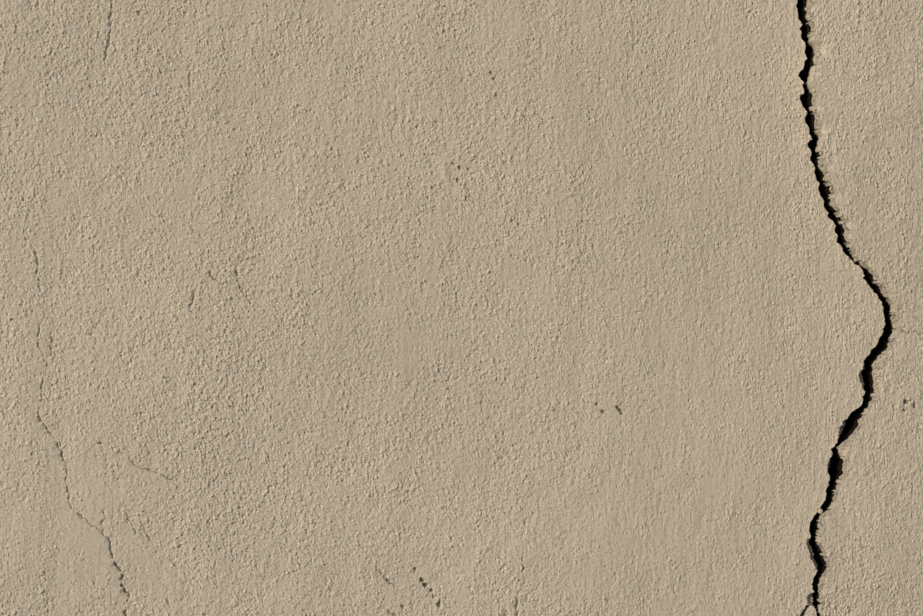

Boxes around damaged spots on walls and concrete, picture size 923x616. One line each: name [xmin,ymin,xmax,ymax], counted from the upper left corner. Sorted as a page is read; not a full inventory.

crack [796,0,919,616]